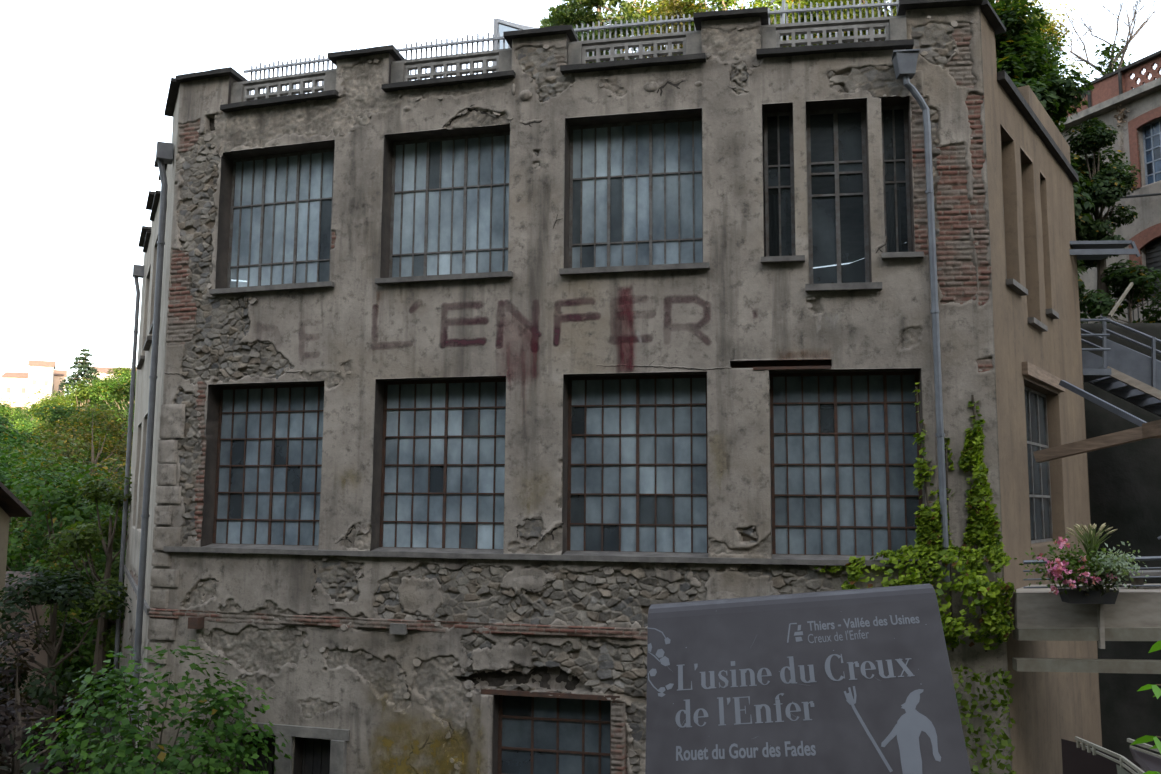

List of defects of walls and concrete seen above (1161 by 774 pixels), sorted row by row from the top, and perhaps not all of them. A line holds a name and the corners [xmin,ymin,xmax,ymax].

flaking render [515,44,575,102]
flaking render [701,26,761,95]
flaking render [829,15,991,306]
spalling [166,57,513,546]
spalling [180,519,850,774]